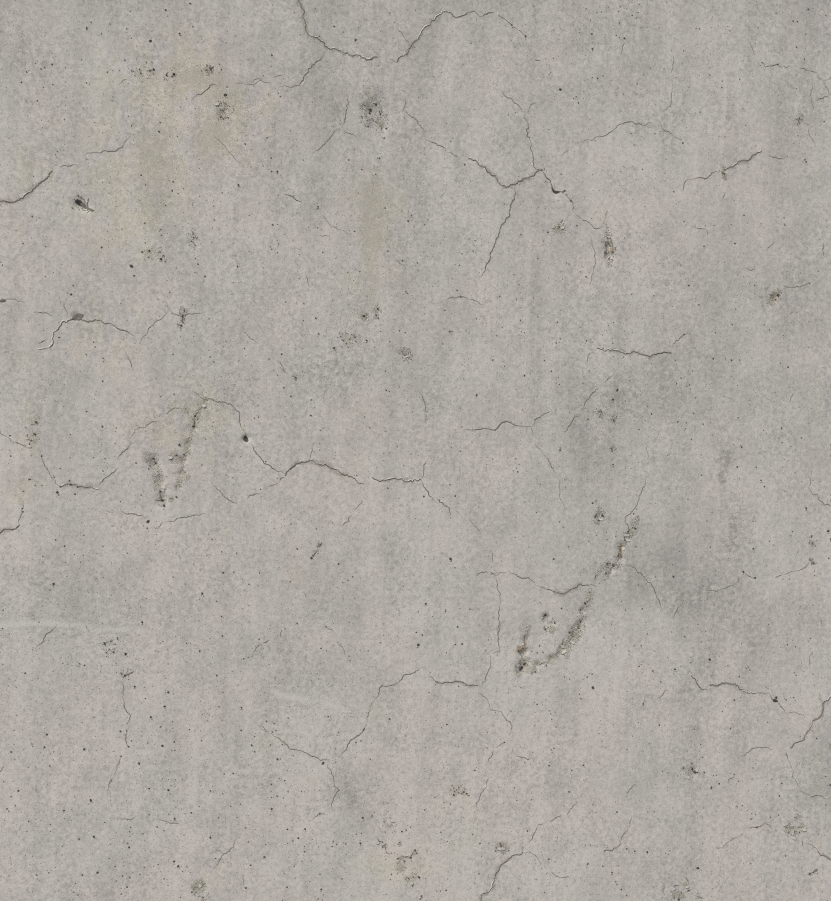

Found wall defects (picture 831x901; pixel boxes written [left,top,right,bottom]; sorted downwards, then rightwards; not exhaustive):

crack [248,0,550,86]
crack [2,140,126,203]
crack [404,92,607,283]
crack [683,150,783,189]
crack [38,306,201,349]
crack [0,395,476,527]
crack [262,553,595,817]
crack [686,673,831,799]